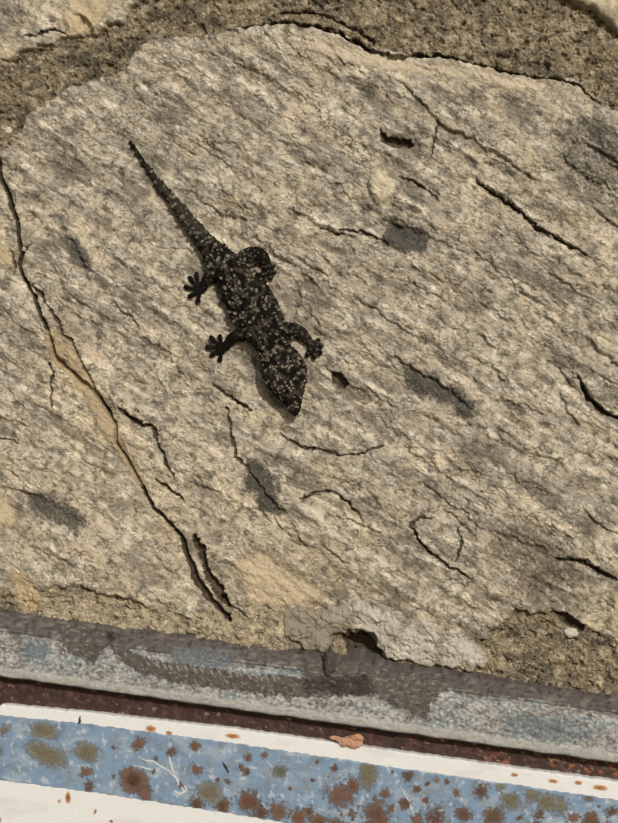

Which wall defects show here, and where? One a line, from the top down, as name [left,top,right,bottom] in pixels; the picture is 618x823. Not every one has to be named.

crack [0,158,252,622]
rust [24,722,99,791]
rust [131,726,155,751]
rust [112,747,176,801]
rust [239,752,268,775]
rust [329,734,364,749]
rust [189,763,617,823]